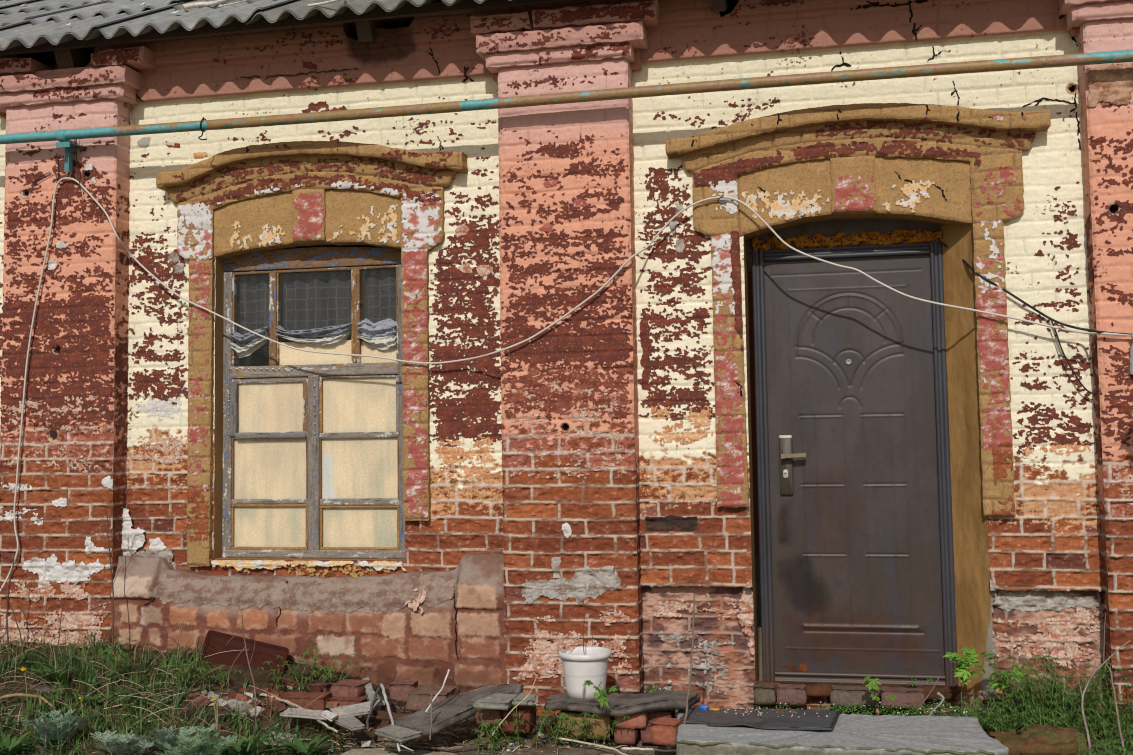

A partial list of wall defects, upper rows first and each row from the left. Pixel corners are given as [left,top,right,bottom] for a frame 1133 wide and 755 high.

peeling [0,47,141,99]
peeling [246,28,357,113]
peeling [417,1,655,95]
peeling [653,97,780,135]
peeling [713,0,797,29]
crack [850,0,941,62]
crack [925,81,960,121]
crack [1021,91,1081,149]
spalling [1066,83,1079,94]
peeling [0,111,1133,542]
spalling [993,606,1104,670]